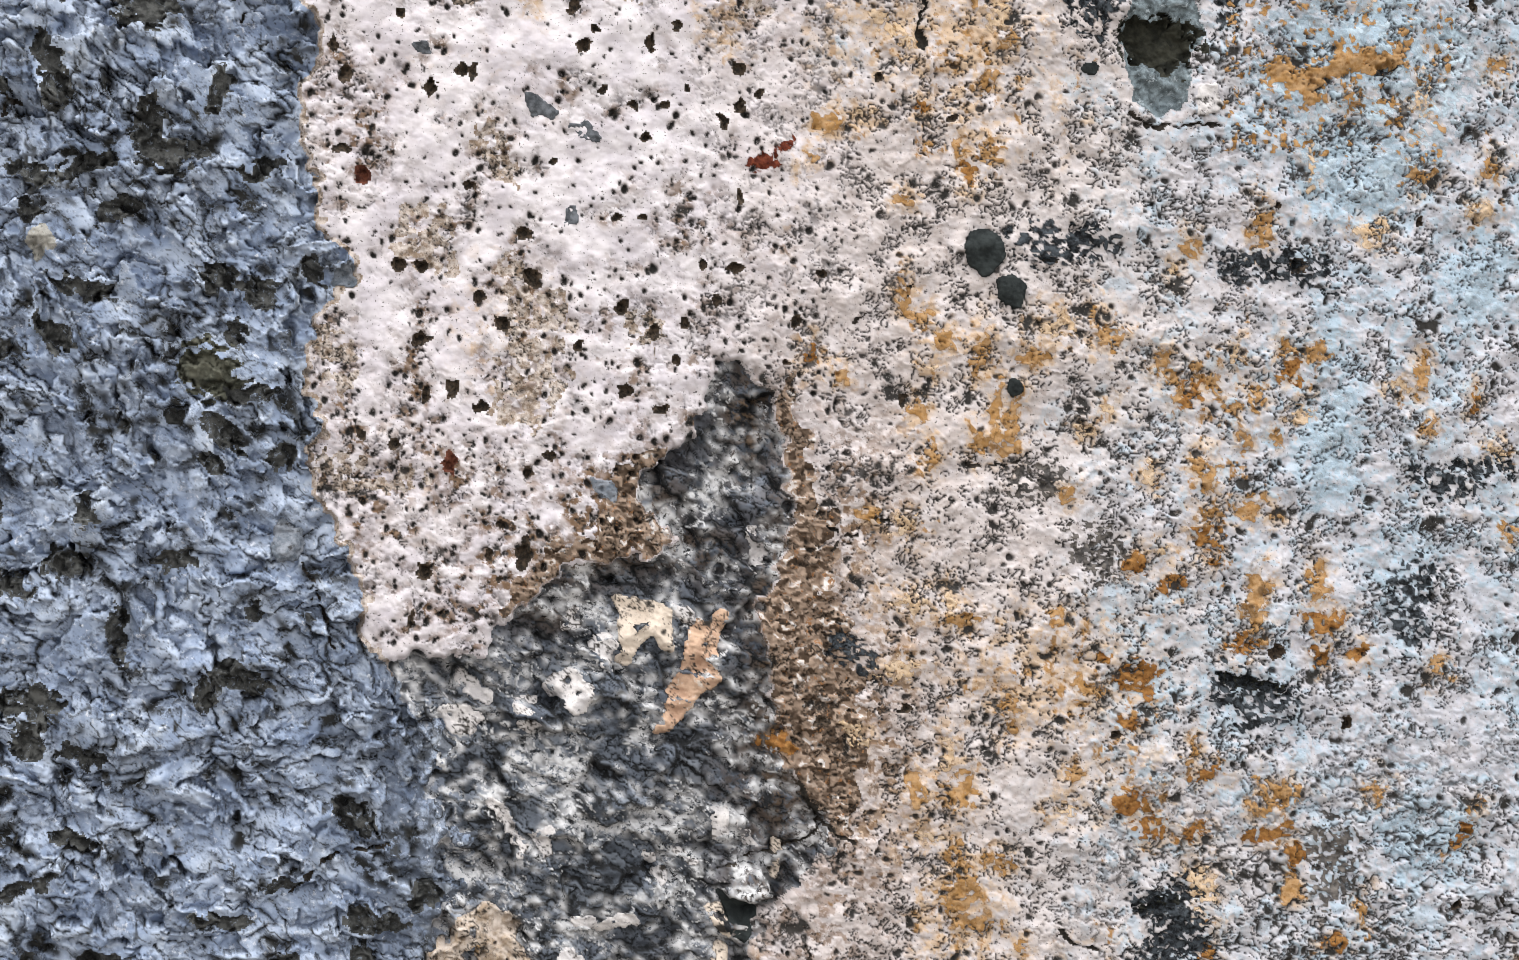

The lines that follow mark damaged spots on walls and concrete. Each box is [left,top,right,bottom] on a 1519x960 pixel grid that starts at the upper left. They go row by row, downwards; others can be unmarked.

spalling [297,0,868,960]